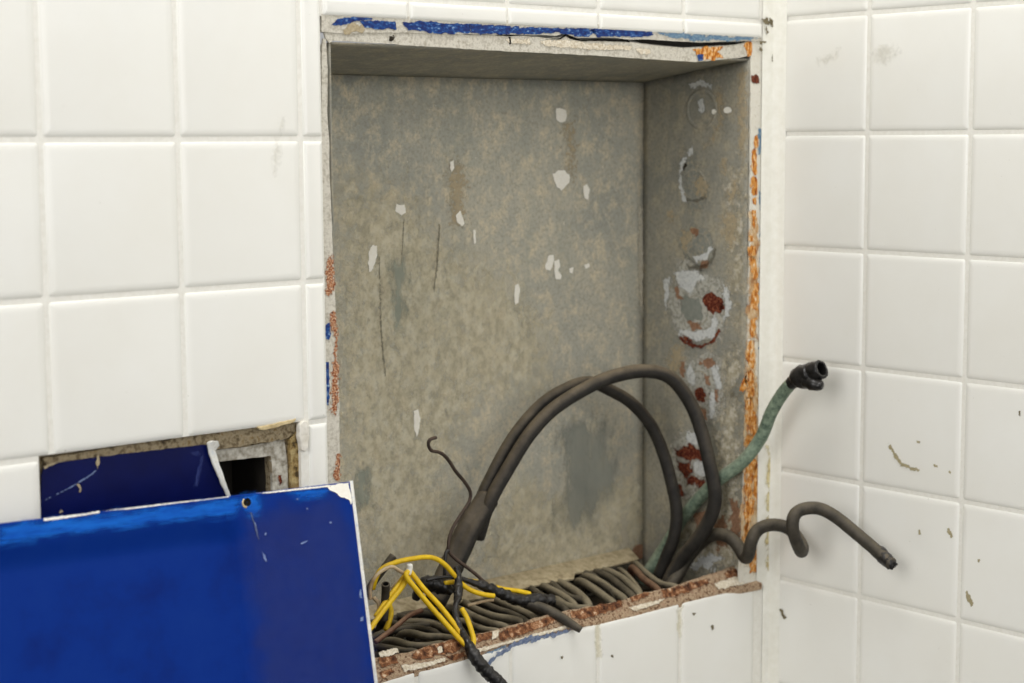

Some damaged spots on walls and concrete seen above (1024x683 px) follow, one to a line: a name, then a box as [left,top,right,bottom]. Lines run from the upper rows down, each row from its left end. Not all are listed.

peeling [332,17,773,62]
corrosion [324,255,336,297]
corrosion [328,310,341,415]
corrosion [724,135,760,579]
spalling [39,418,352,521]
corrosion [570,579,710,619]
flaking render [629,599,664,611]
flaking render [715,577,744,589]
corrosion [378,655,399,679]
flaking render [379,646,445,672]
corrosion [412,617,556,661]
flaking render [478,625,568,652]